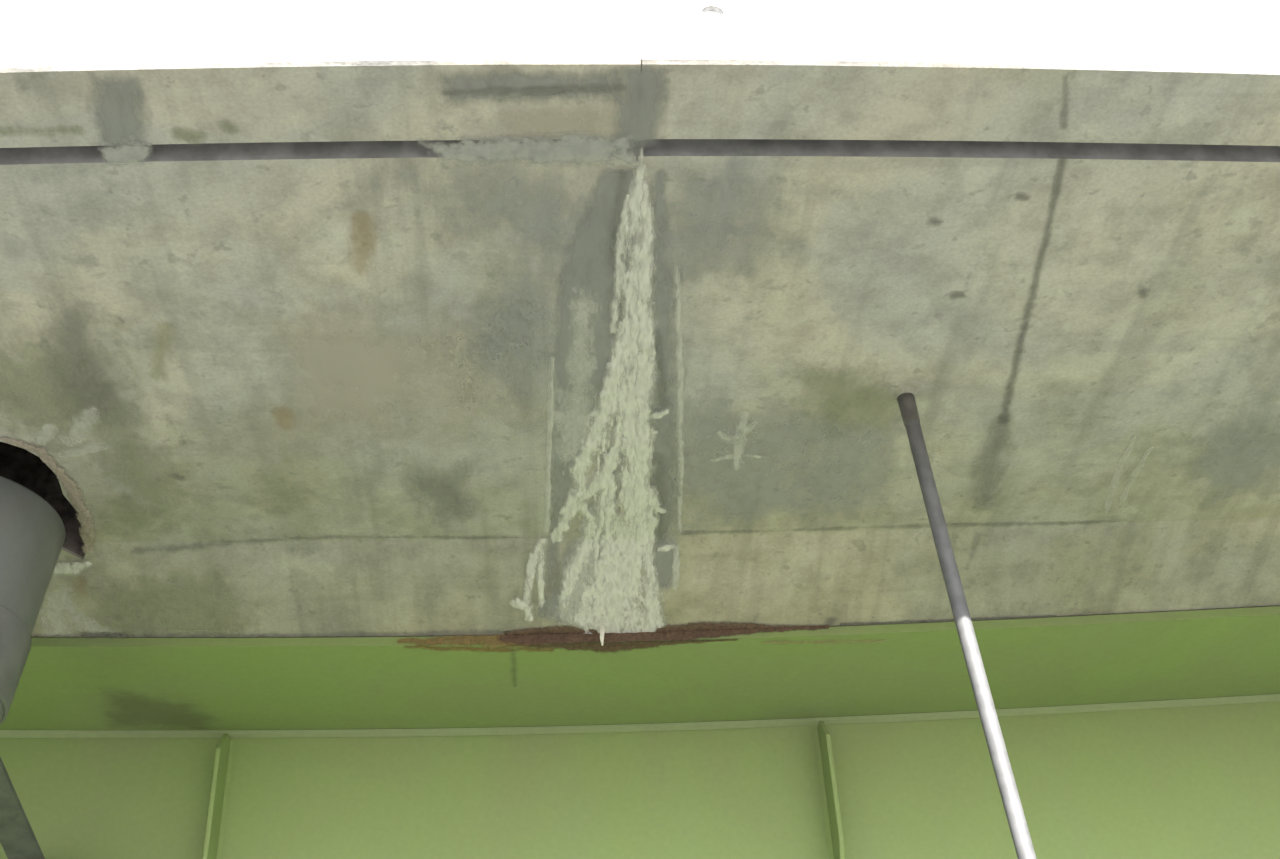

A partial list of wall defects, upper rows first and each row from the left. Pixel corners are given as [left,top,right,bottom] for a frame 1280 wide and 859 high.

corrosion [397,622,829,652]
damp [450,69,882,646]